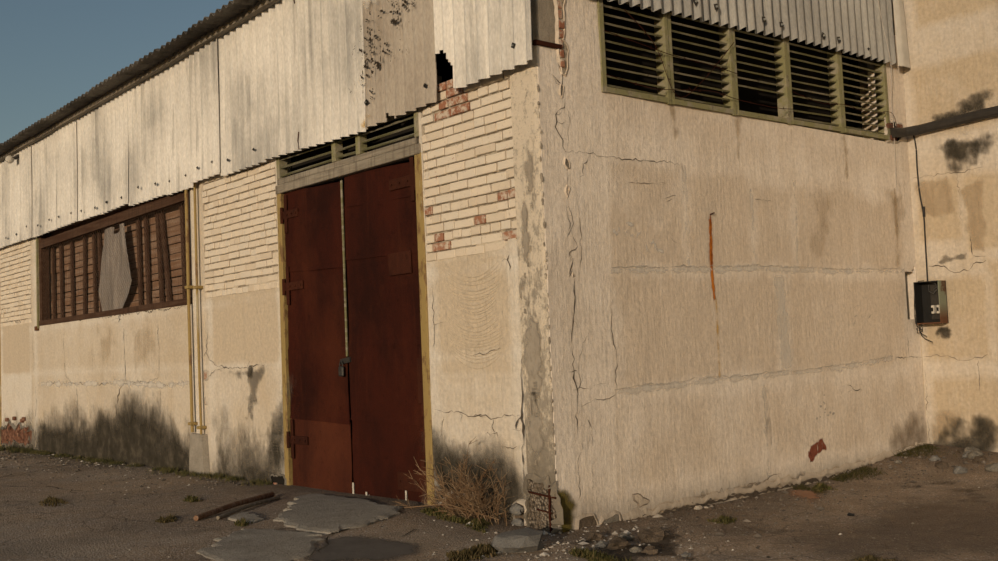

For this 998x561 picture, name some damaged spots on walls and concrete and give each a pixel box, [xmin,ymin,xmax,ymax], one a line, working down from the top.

flaking render [553,0,569,98]
crack [554,64,683,181]
rust [709,212,717,307]
crack [566,207,618,498]
water stain [6,399,190,472]